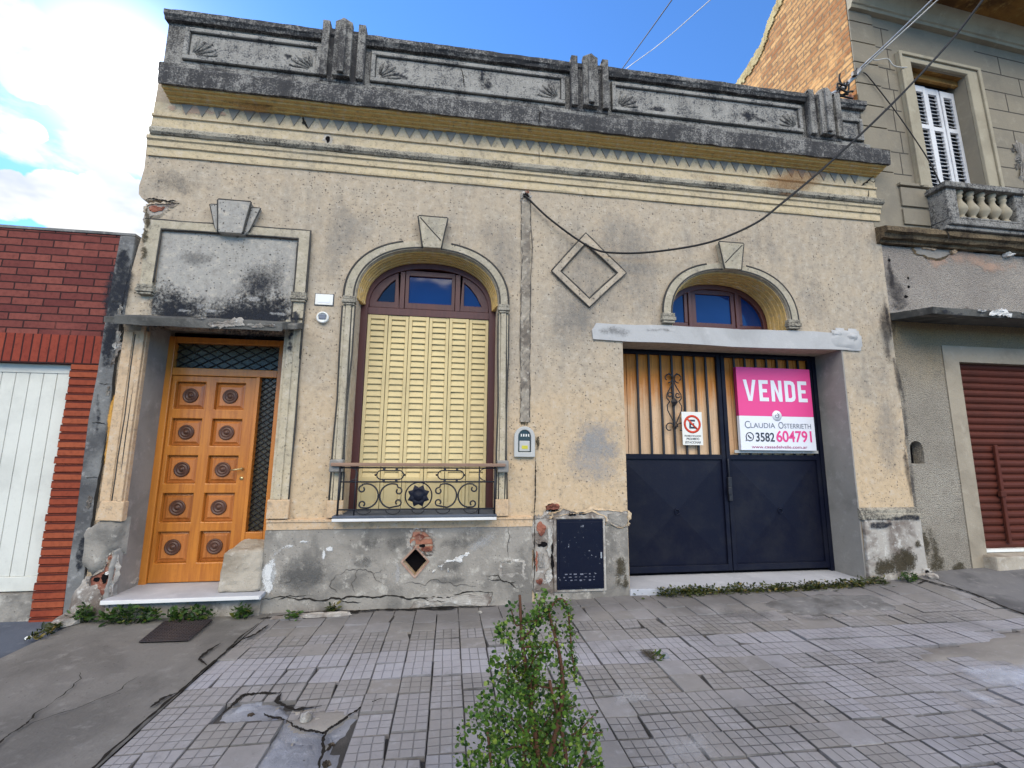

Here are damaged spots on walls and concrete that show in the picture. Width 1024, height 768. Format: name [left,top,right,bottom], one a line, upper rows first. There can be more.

spalling [143,201,180,222]
water stain [151,274,299,350]
spalling [86,550,139,599]
crack [262,457,537,603]
spalling [406,527,470,573]
spalling [499,500,632,596]
water stain [867,515,920,529]